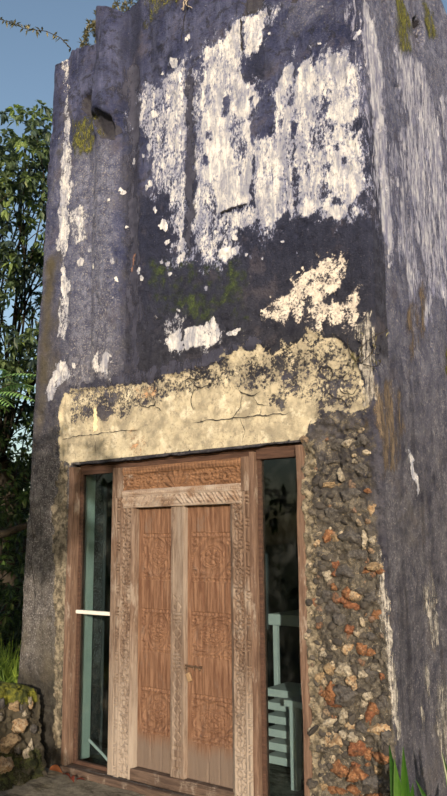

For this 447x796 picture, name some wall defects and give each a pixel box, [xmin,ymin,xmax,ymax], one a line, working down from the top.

peeling [54,60,94,341]
leakage [69,64,262,391]
peeling [93,0,403,283]
crack [62,430,135,455]
flaking render [45,250,370,796]
crack [185,377,288,434]